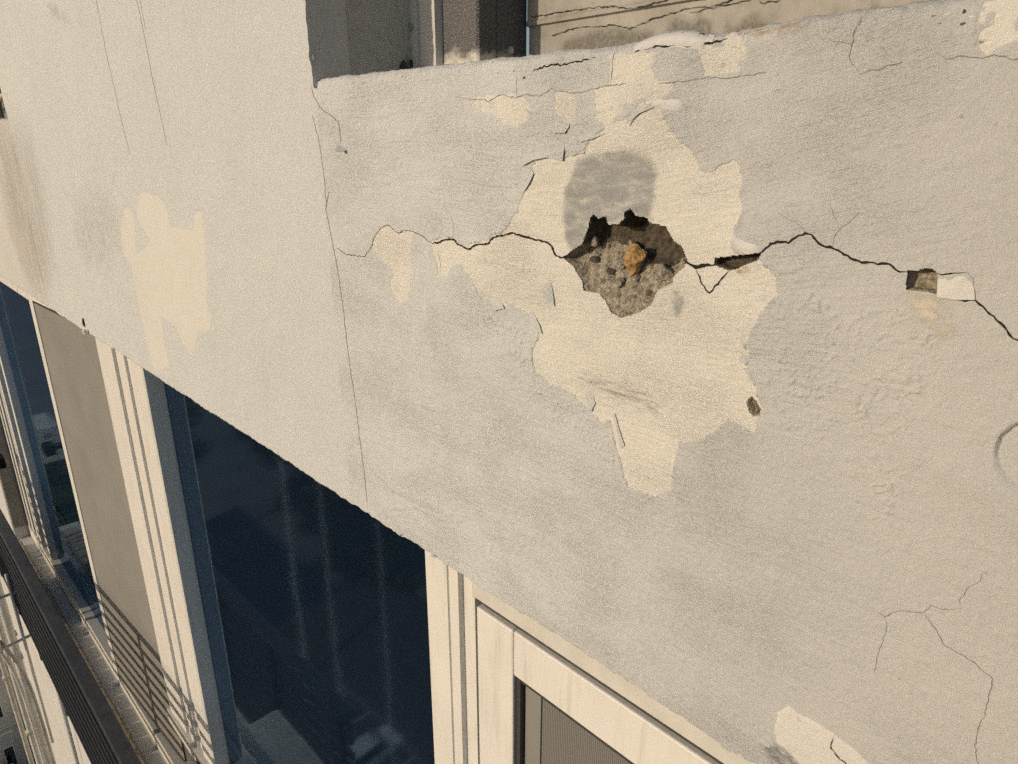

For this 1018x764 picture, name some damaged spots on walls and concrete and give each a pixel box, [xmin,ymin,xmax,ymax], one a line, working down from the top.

crack [455,38,727,115]
crack [659,72,765,84]
crack [829,9,902,74]
crack [938,52,1018,60]
peeling [120,192,212,372]
crack [311,88,568,498]
peeling [431,50,777,497]
crack [684,260,727,293]
crack [758,211,911,273]
crack [937,272,1018,341]
crack [875,574,993,764]
peeling [760,706,868,764]